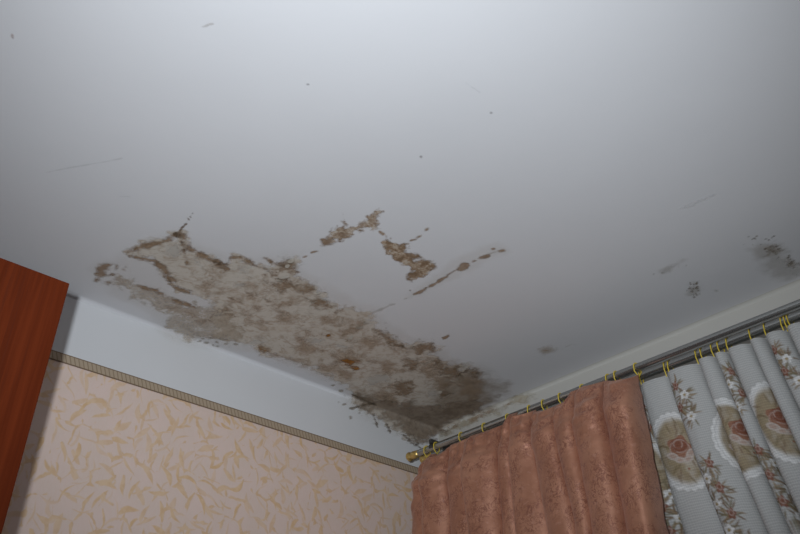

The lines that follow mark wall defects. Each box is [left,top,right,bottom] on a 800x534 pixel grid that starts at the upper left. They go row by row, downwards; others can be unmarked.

damp [95,264,113,283]
damp [320,211,435,280]
damp [458,248,505,271]
damp [124,229,483,448]